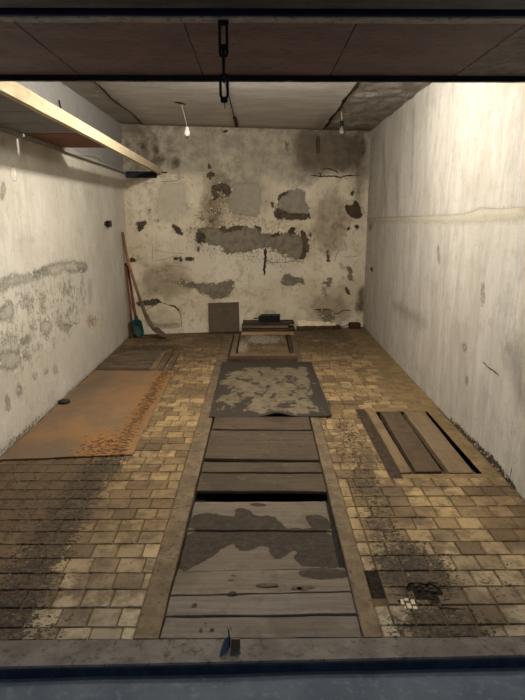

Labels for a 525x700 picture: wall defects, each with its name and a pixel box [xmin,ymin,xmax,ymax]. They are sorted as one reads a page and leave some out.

crack [311,168,357,178]
flaking render [171,164,311,265]
flaking render [344,190,364,230]
crack [263,248,303,275]
flaking render [180,278,235,300]
flaking render [281,274,305,286]